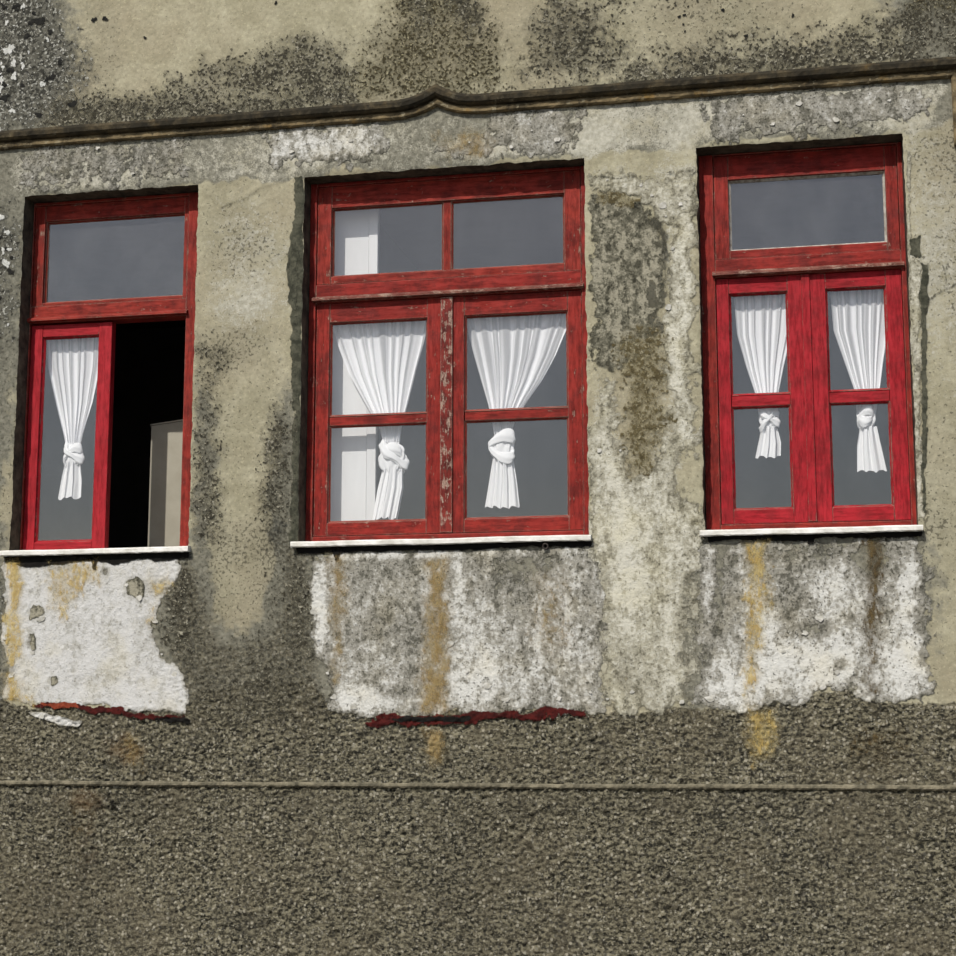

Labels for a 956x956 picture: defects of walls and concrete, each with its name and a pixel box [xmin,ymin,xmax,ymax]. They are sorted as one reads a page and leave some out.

mould [0,0,956,151]
peeling [306,150,940,719]
peeling [0,558,189,727]
corrosion [422,561,450,711]
corrosion [744,540,772,687]
corrosion [751,710,777,755]